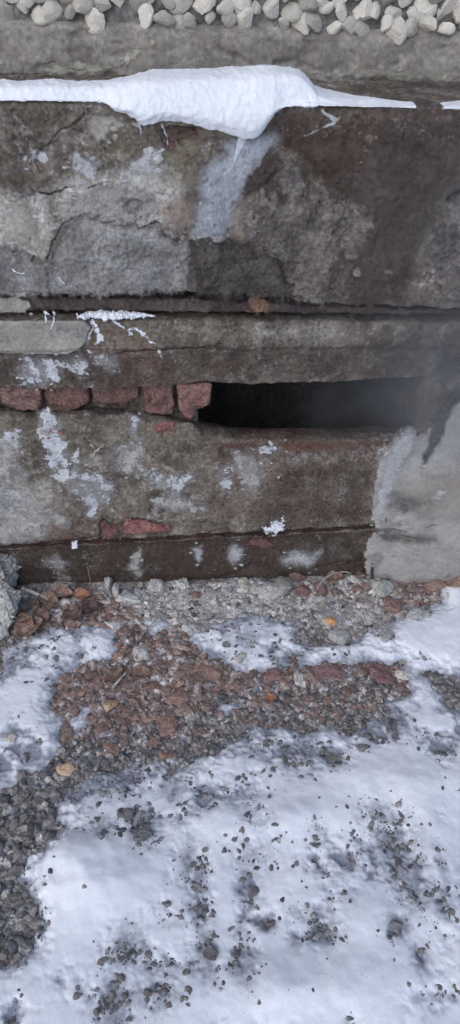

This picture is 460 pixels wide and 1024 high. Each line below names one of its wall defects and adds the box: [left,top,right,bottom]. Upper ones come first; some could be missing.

crack [44,220,69,261]
crack [34,112,102,195]
water stain [166,134,287,239]
water stain [294,127,440,317]
water stain [37,407,114,517]
water stain [0,428,365,585]